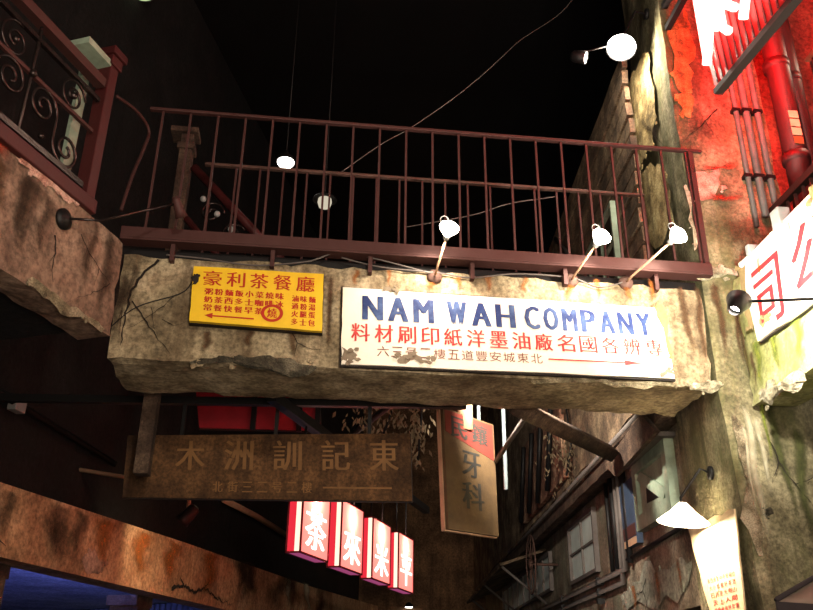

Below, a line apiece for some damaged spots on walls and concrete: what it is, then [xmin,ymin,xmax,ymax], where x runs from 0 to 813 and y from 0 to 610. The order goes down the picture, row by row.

peeling [667,10,696,119]
crack [120,259,179,352]
spalling [531,302,724,395]
spalling [758,368,806,411]
leakage [792,319,801,352]
leakage [743,404,813,528]
crack [171,575,230,604]